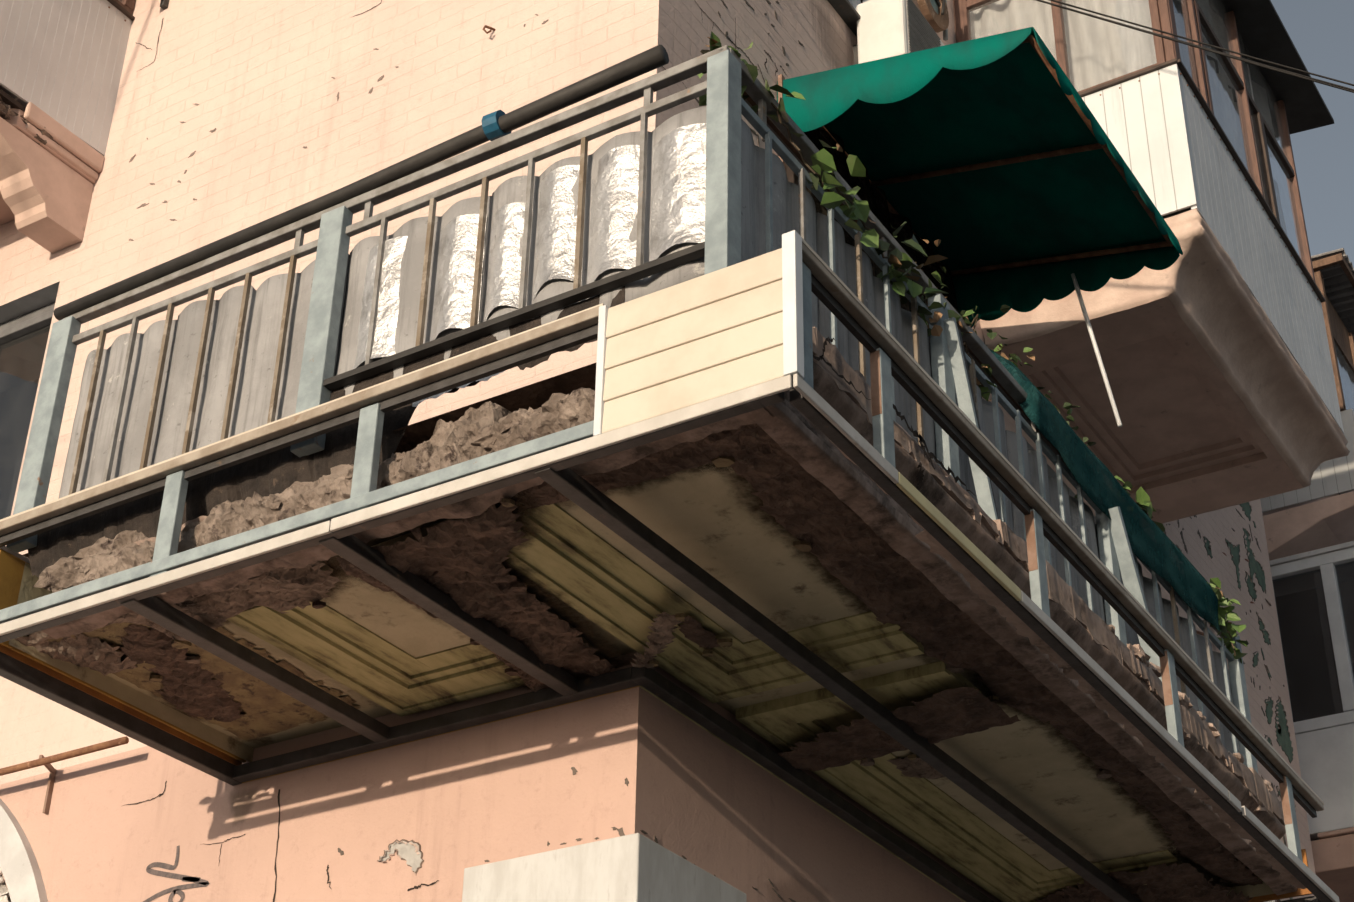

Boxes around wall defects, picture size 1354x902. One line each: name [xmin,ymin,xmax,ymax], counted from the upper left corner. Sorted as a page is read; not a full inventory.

spalling [0,89,60,145]
flaking render [812,326,873,428]
spalling [376,387,595,490]
spalling [177,464,354,553]
spalling [34,530,156,593]
spalling [366,481,630,680]
spalling [171,555,445,709]
spalling [470,638,549,692]
spalling [579,424,1306,902]
crack [272,789,280,902]
peeling [377,839,424,874]